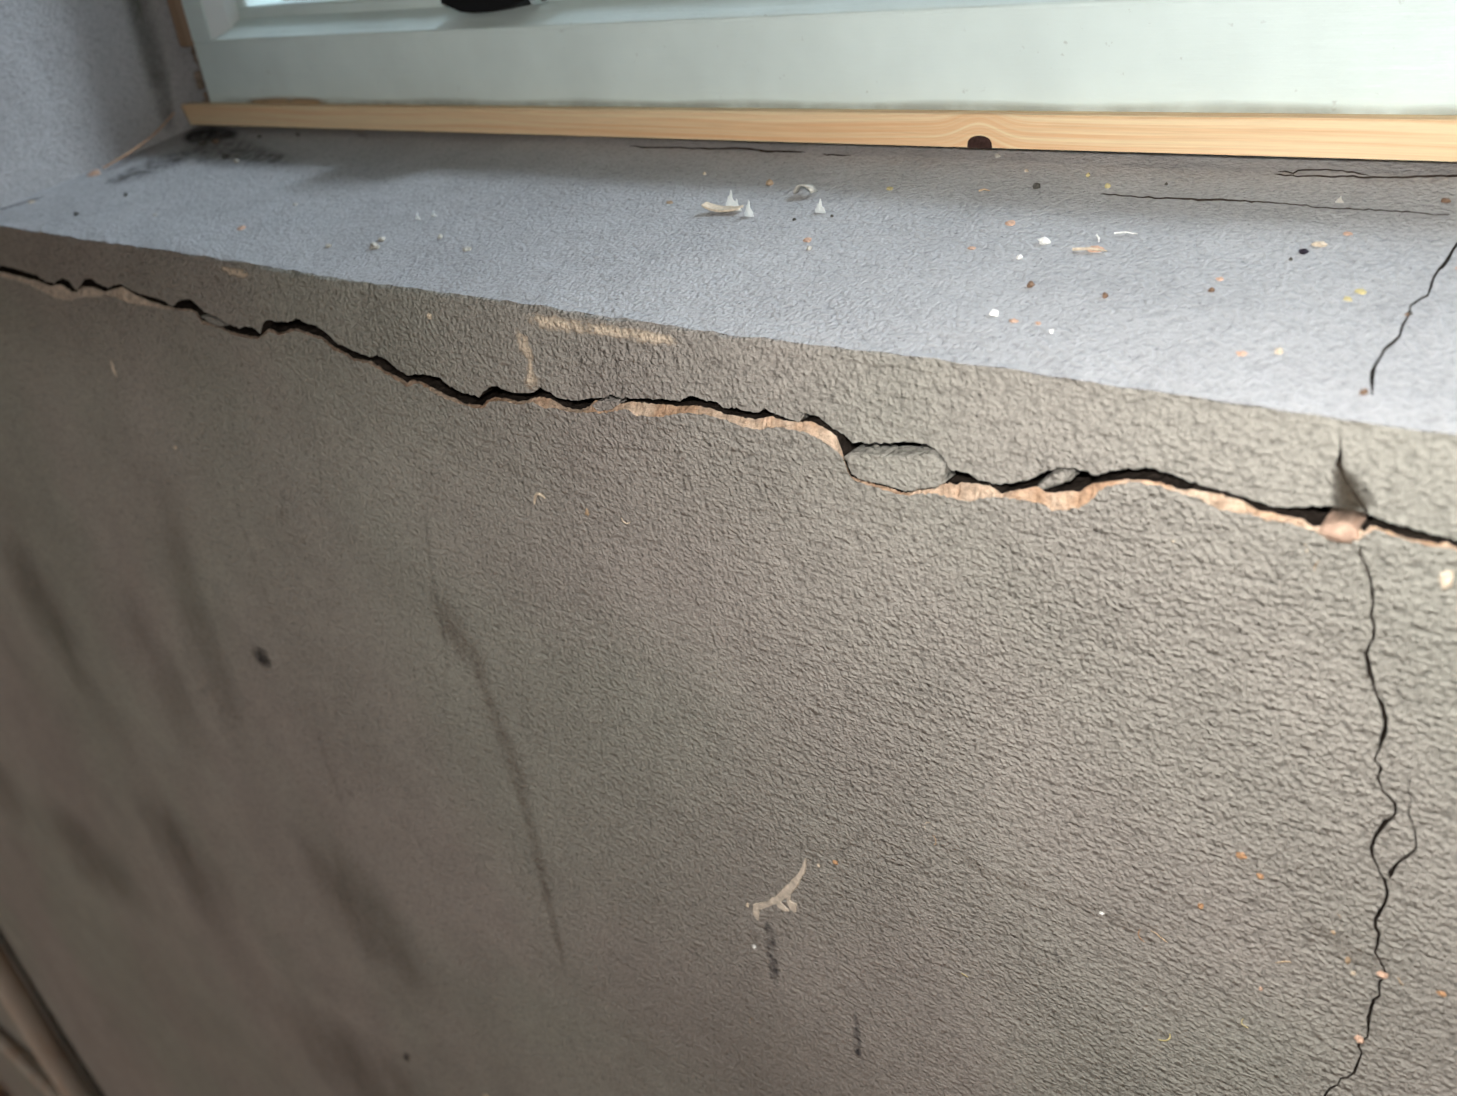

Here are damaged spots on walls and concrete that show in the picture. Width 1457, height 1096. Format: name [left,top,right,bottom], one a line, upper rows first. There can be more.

crack [0,266,1457,1096]
crack [1103,169,1457,395]